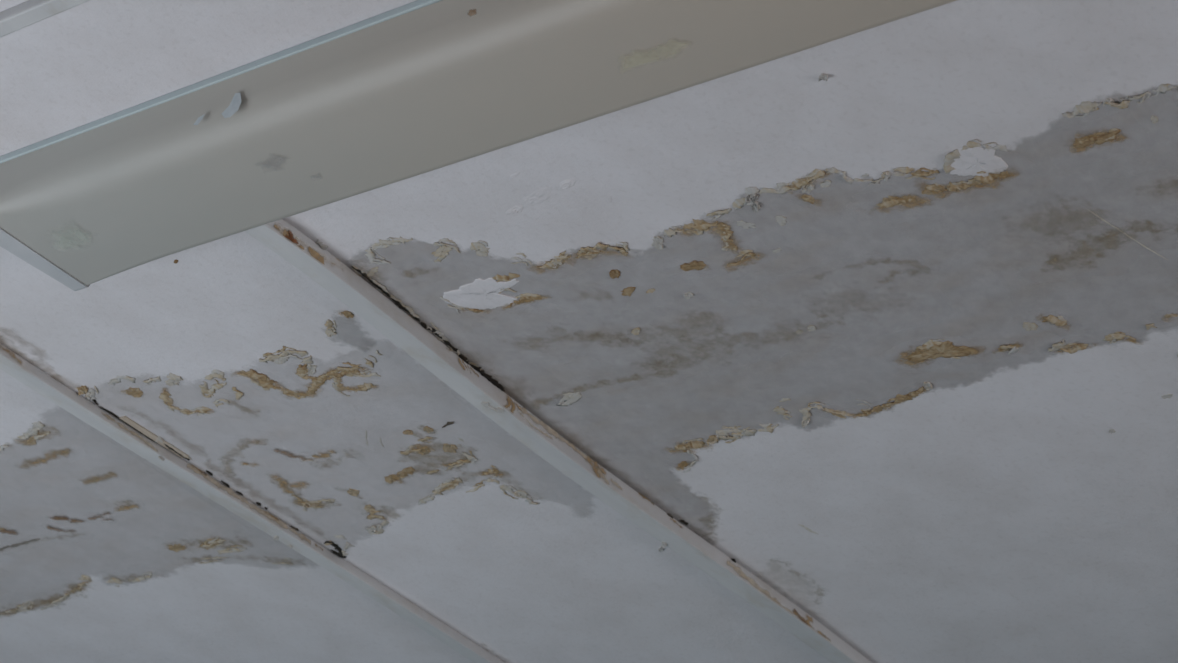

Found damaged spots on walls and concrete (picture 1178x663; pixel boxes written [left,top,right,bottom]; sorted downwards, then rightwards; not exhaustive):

peeling [1073,128,1126,152]
peeling [652,139,1015,267]
peeling [440,242,629,314]
peeling [609,269,655,296]
peeling [680,260,706,271]
peeling [900,339,979,365]
peeling [1023,315,1088,354]
peeling [76,346,382,416]
peeling [667,381,933,473]
peeling [384,426,540,505]
peeling [347,488,389,535]
flaking render [324,535,355,558]